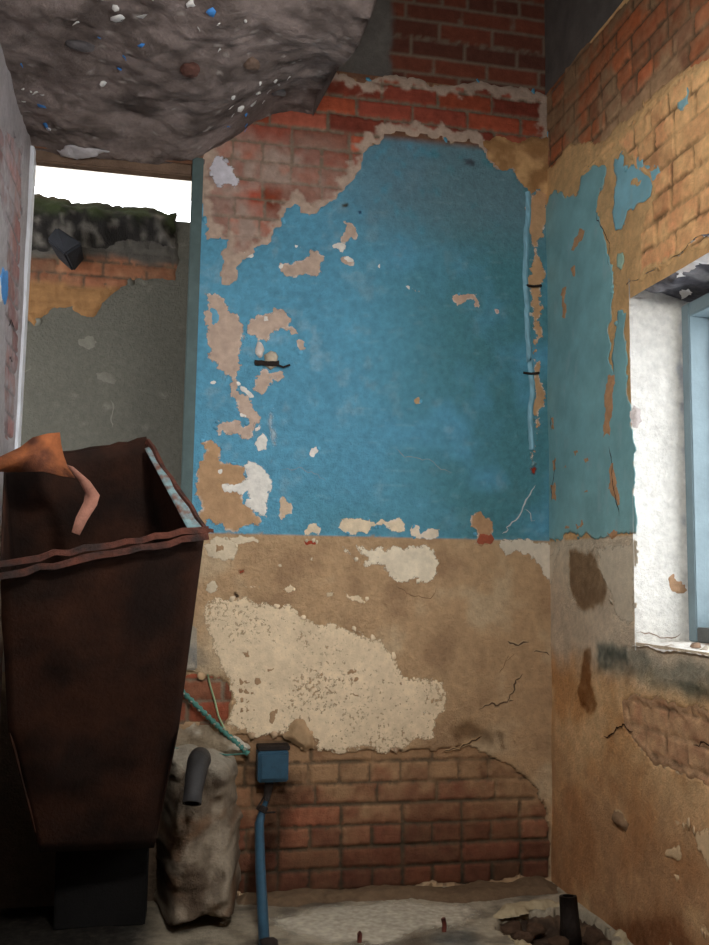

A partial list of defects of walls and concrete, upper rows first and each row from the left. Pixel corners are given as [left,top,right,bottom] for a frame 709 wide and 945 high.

peeling [102,0,147,22]
flaking render [145,0,709,626]
crack [479,640,549,710]
flaking render [179,578,550,896]
flaking render [622,693,709,786]
peeling [665,845,682,861]
peeling [675,817,709,868]